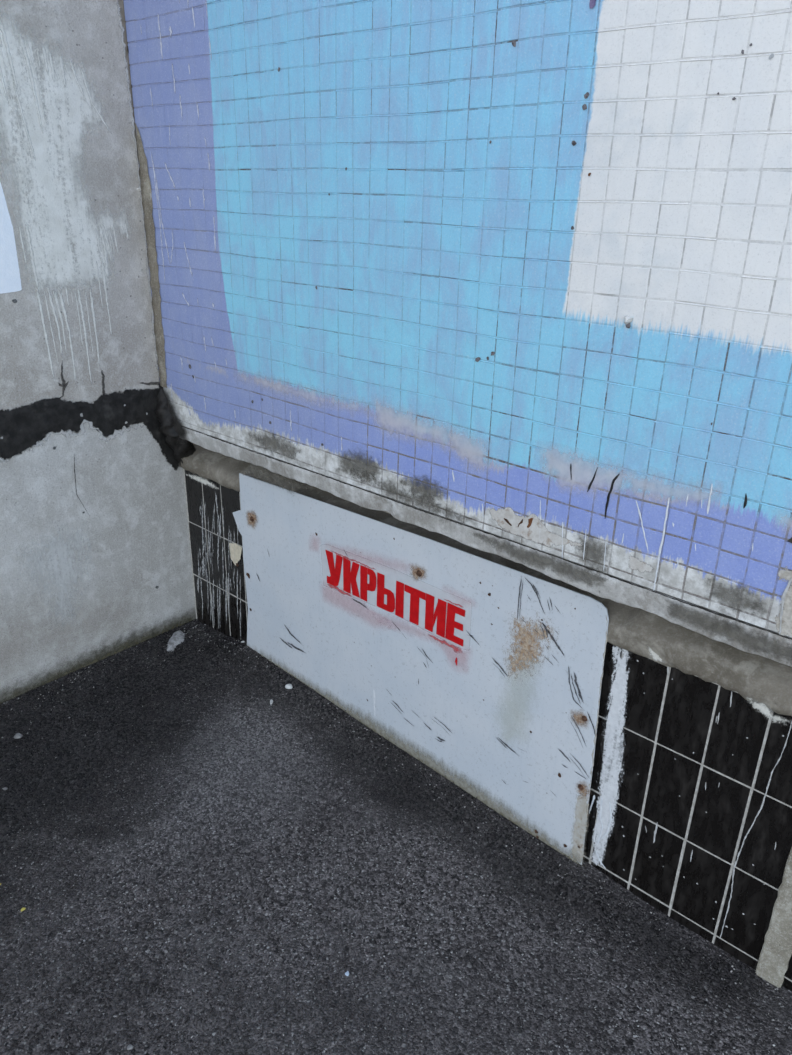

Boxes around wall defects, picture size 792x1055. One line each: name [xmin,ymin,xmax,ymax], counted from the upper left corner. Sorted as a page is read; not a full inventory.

water stain [244,465,304,491]
water stain [341,437,470,520]
peeling [490,507,582,547]
spalling [775,566,792,637]